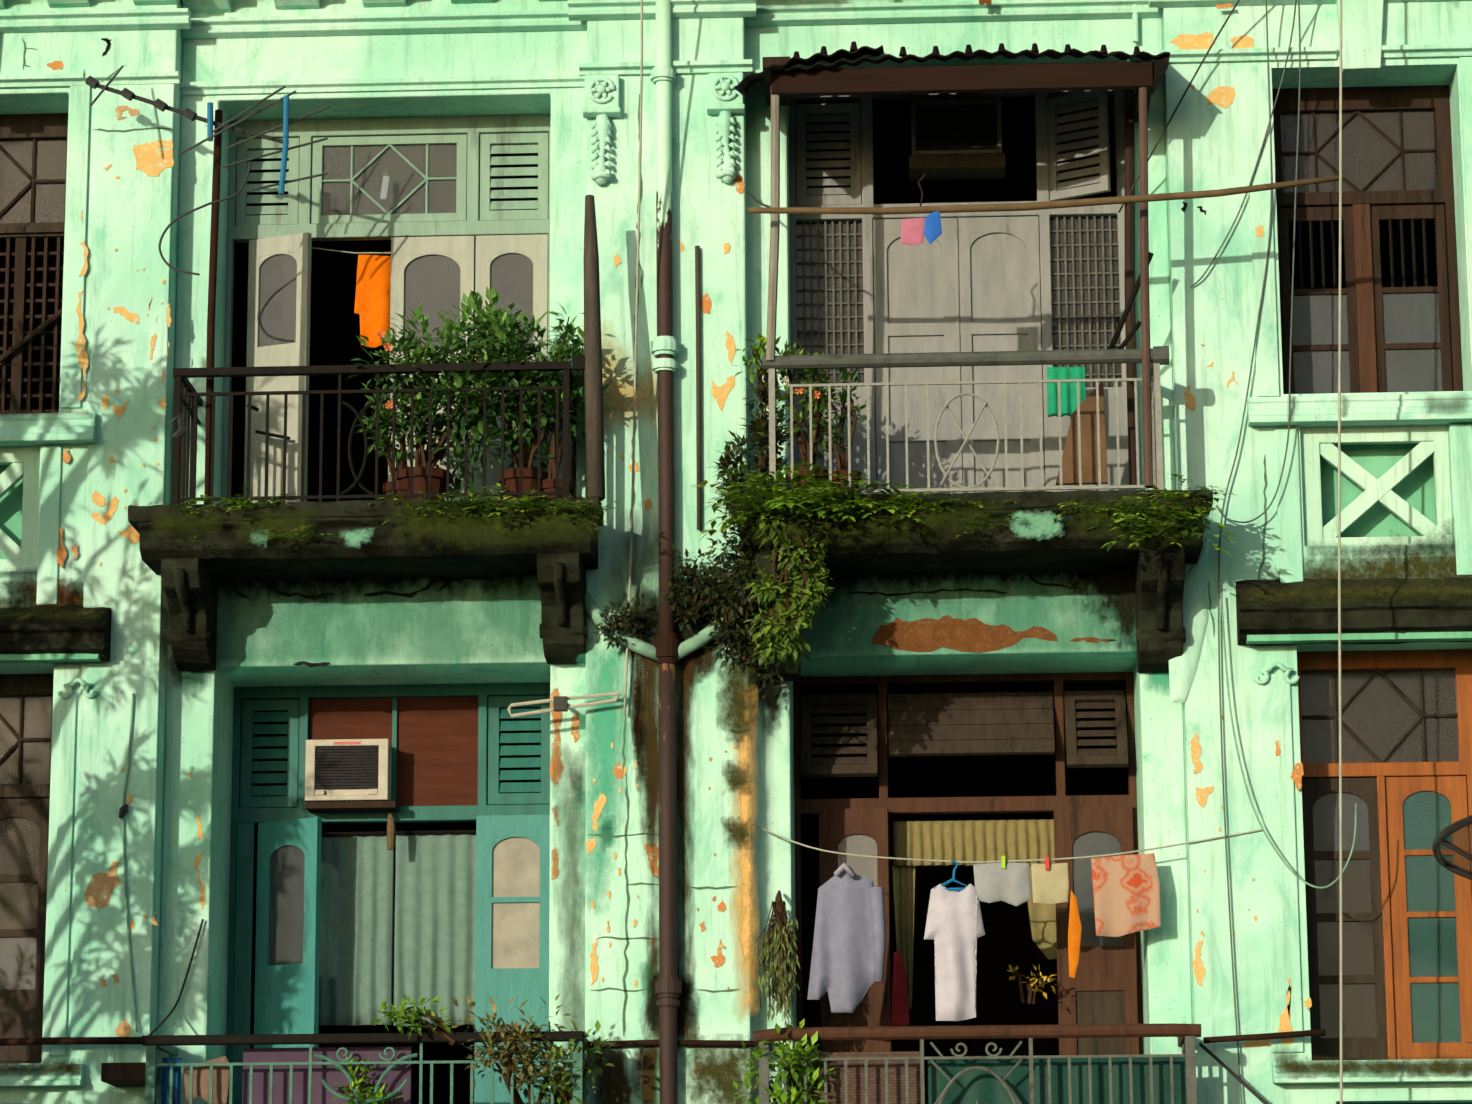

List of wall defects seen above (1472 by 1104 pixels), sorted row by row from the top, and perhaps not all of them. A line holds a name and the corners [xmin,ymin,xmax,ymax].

peeling [1170,32,1254,50]
peeling [1190,84,1235,108]
peeling [133,140,174,177]
peeling [75,241,129,418]
water stain [4,578,37,594]
flaking render [872,615,1115,653]
water stain [617,591,756,1104]
peeling [84,861,121,909]
water stain [564,765,585,1031]
water stain [587,916,659,1104]